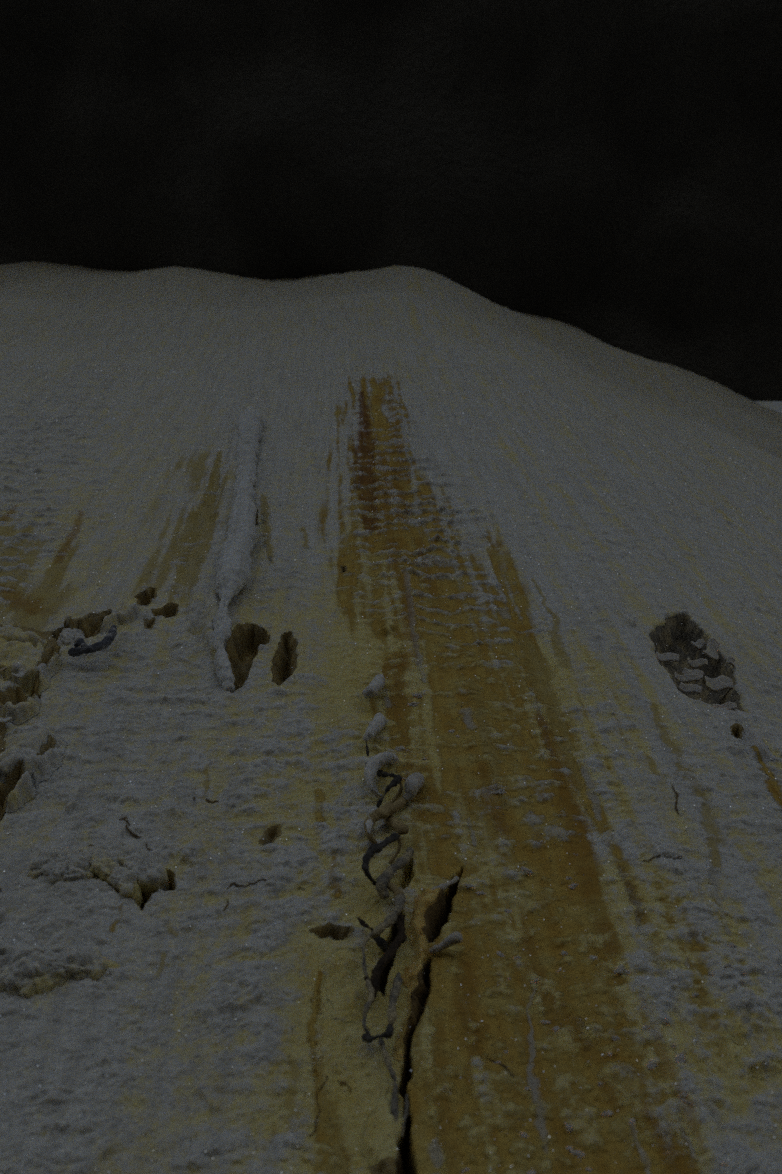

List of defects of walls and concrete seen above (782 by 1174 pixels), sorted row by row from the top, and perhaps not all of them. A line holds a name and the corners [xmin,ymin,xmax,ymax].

spalling [0,608,112,821]
spalling [78,842,175,911]
spalling [134,587,179,629]
spalling [225,623,298,693]
rust [320,376,699,1174]
spalling [650,612,744,740]
rust [286,970,348,1174]
crack [379,873,462,1174]